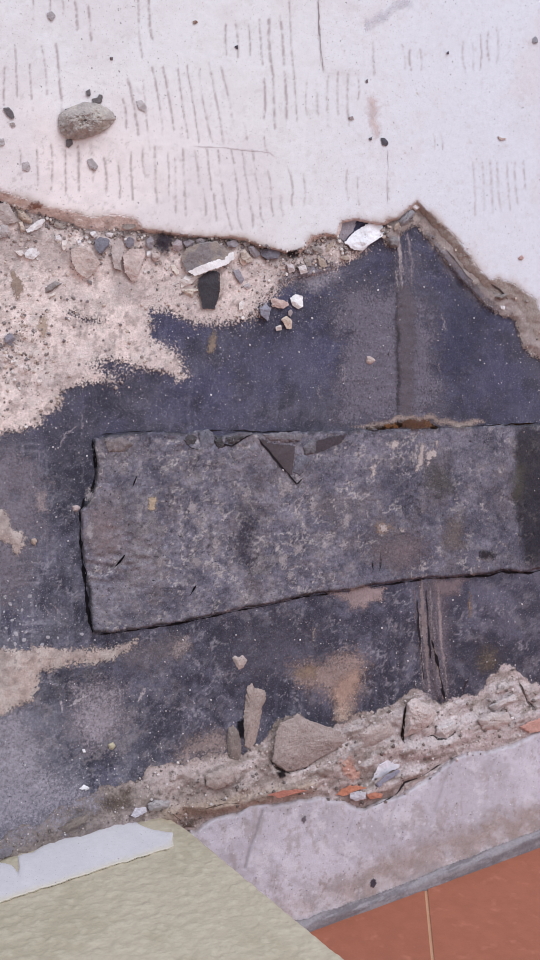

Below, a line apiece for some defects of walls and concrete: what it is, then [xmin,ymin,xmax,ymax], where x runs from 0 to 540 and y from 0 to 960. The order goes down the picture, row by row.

flaking render [0,192,540,605]
crack [79,430,348,635]
crack [371,549,540,588]
peeling [232,655,247,670]
flaking render [0,673,174,903]
flaking render [350,791,366,801]
flaking render [372,759,400,780]